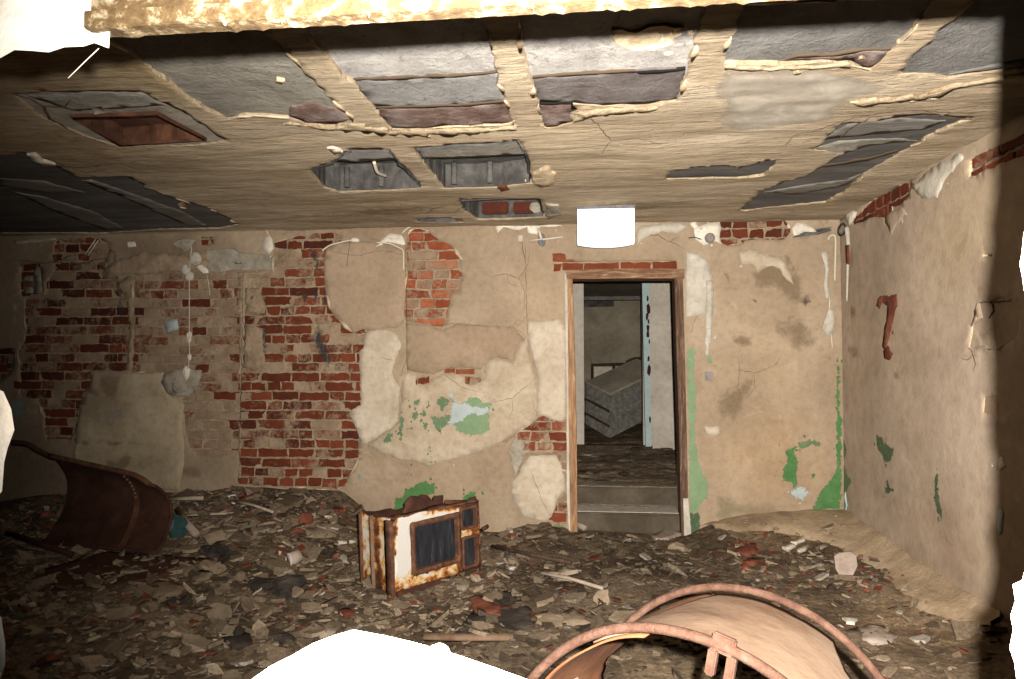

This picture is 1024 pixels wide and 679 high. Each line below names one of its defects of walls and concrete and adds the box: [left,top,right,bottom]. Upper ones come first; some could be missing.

flaking render [516,15,525,53]
flaking render [611,24,699,62]
spalling [15,91,224,145]
flaking render [232,84,517,138]
crack [569,112,659,153]
flaking render [573,104,664,123]
flaking render [27,152,56,166]
flaking render [845,181,912,234]
crack [979,298,1013,319]
flaking render [0,228,567,546]
peeling [777,358,851,518]
peeling [874,435,894,467]